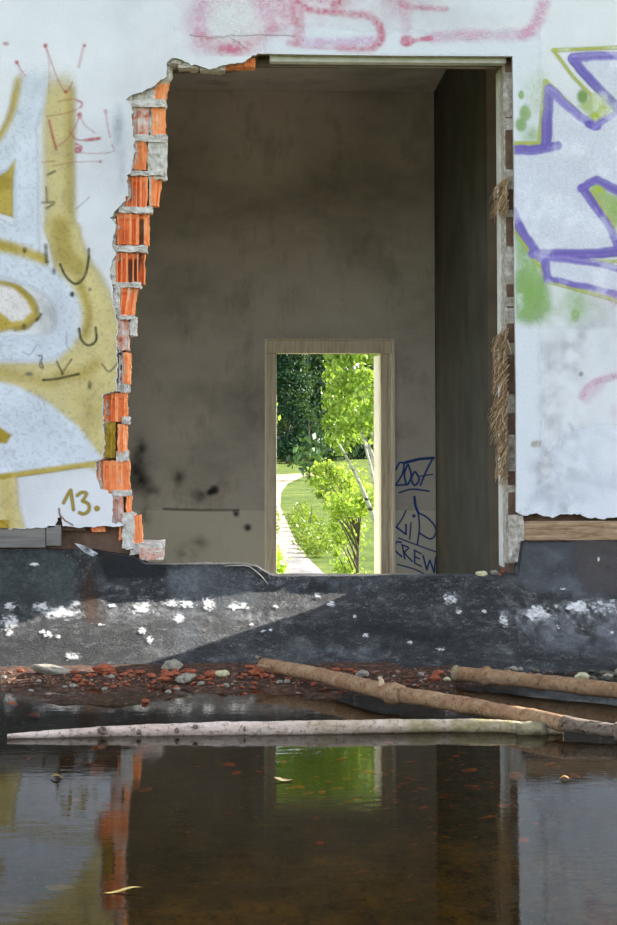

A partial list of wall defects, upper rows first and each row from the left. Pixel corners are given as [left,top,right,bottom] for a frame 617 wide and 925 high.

spalling [167,58,255,75]
spalling [91,83,170,560]